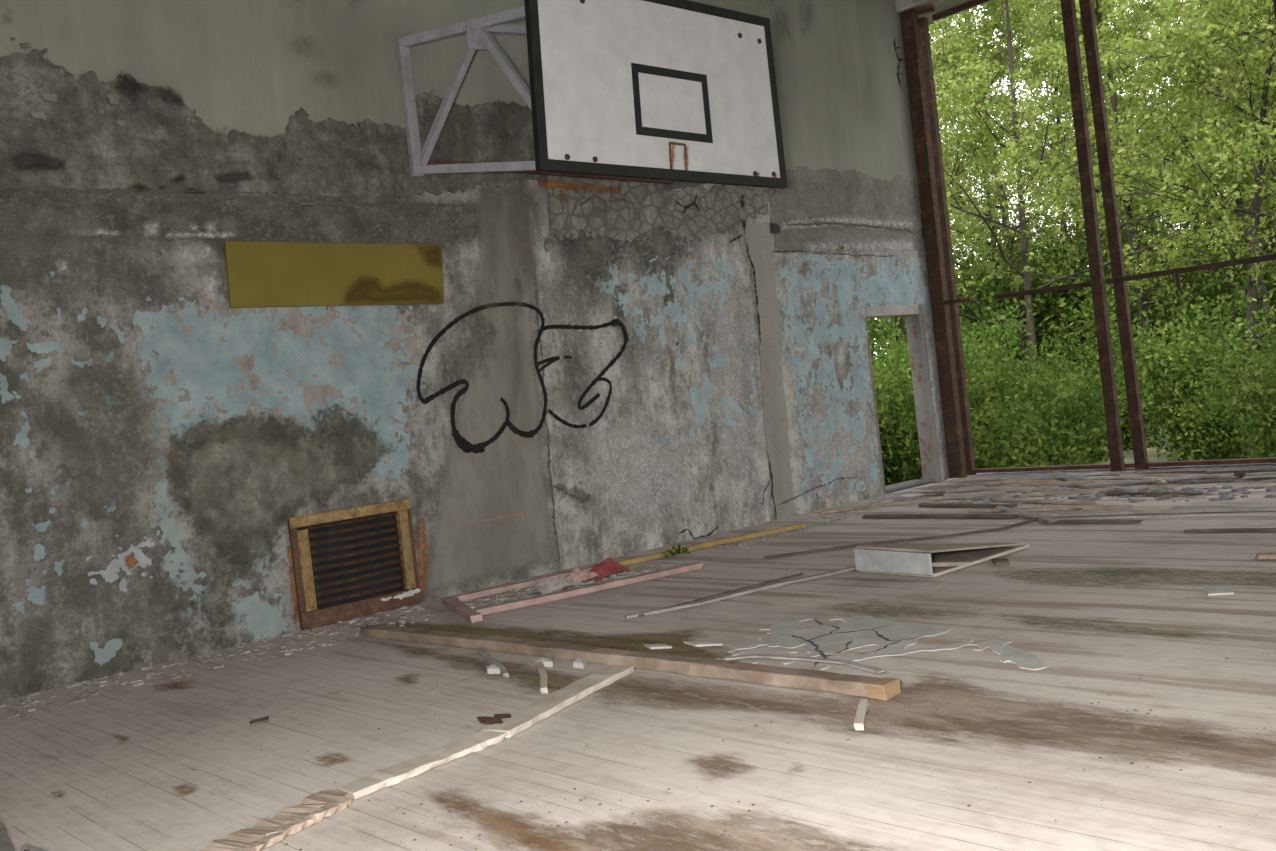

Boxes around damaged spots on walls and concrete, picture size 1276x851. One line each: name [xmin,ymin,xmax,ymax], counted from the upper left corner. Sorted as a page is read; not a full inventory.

flaking render [0,37,547,207]
flaking render [770,166,923,235]
peeling [0,285,428,482]
peeling [595,248,761,444]
peeling [775,252,947,501]
peeling [15,489,65,614]
peeling [89,638,123,666]
peeling [81,459,298,647]
water stain [0,405,390,701]
crack [780,619,915,668]